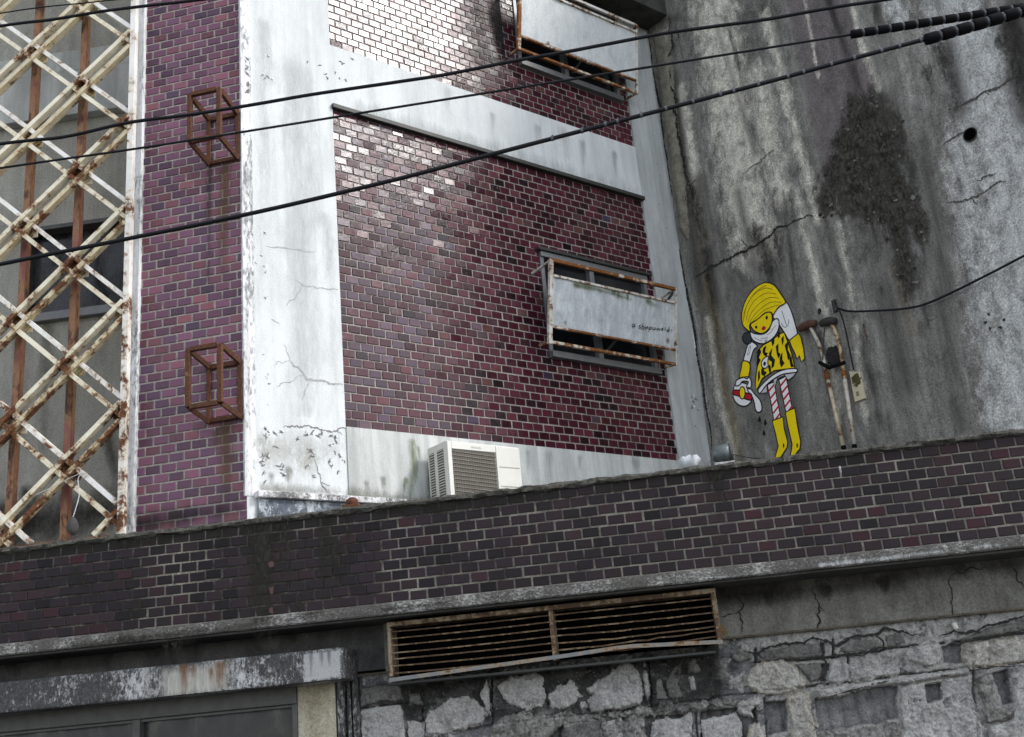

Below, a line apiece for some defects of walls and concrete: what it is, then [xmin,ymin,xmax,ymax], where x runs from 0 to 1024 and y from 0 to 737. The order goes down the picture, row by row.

crack [942,74,1018,146]
crack [948,174,1005,204]
crack [695,214,813,279]
crack [271,280,343,400]
peeling [259,426,286,483]
peeling [296,430,345,478]
crack [721,566,1024,697]